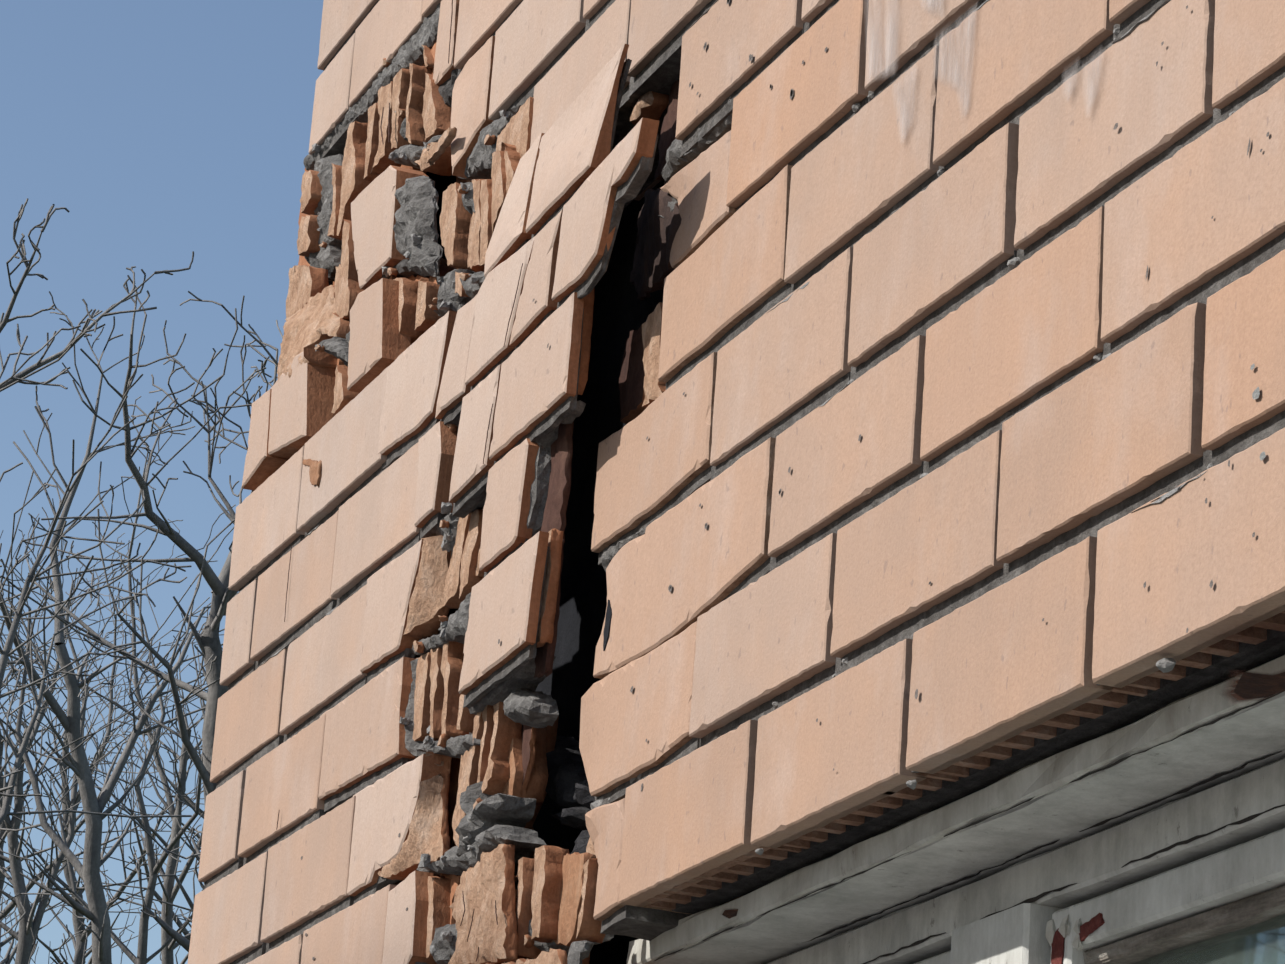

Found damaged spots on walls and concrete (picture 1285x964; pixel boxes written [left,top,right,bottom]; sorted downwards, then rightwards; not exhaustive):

spalling [242,0,534,491]
crack [426,172,457,259]
crack [533,80,911,964]
spalling [378,497,614,964]
crack [803,751,1285,943]
crack [944,690,1285,837]
corrosion [1225,671,1285,702]
crack [862,932,946,964]